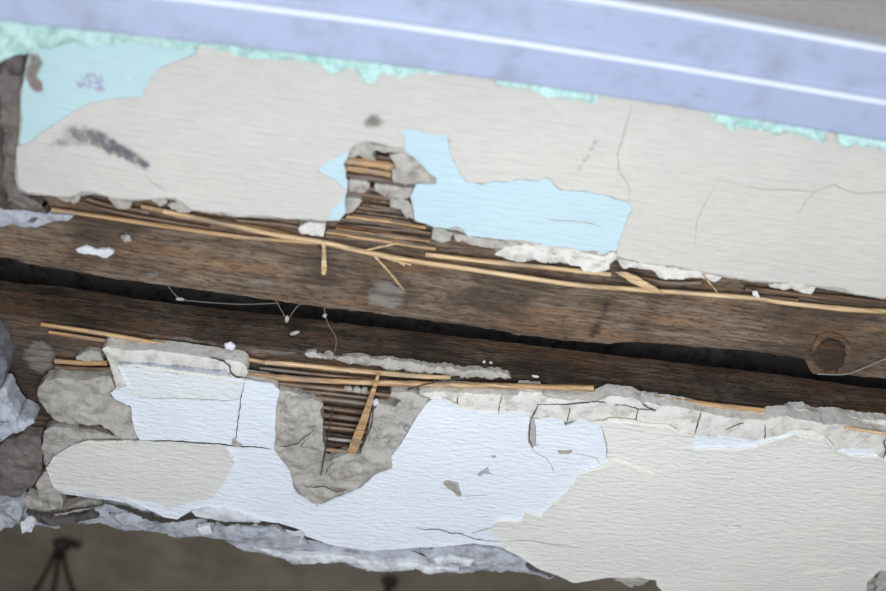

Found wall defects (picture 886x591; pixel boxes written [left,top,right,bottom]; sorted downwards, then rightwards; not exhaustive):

flaking render [317,129,632,254]
crack [694,180,886,246]
flaking render [0,337,886,579]
spalling [613,578,662,591]
spalling [866,570,886,591]